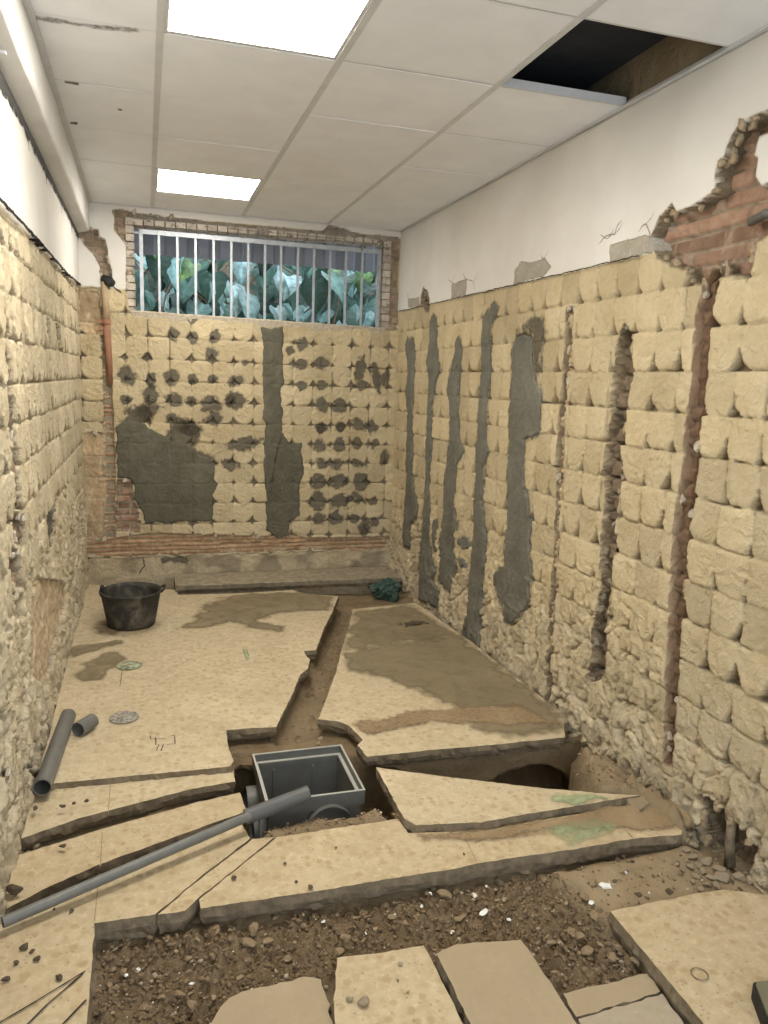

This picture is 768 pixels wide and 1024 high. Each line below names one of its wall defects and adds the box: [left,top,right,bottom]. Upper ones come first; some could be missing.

flaking render [609,114,768,299]
flaking render [78,226,112,346]
spalling [113,208,430,330]
peeling [514,258,551,284]
flaking render [82,430,390,557]
leakage [344,301,563,736]
leakage [70,623,126,681]
leakage [182,592,332,631]